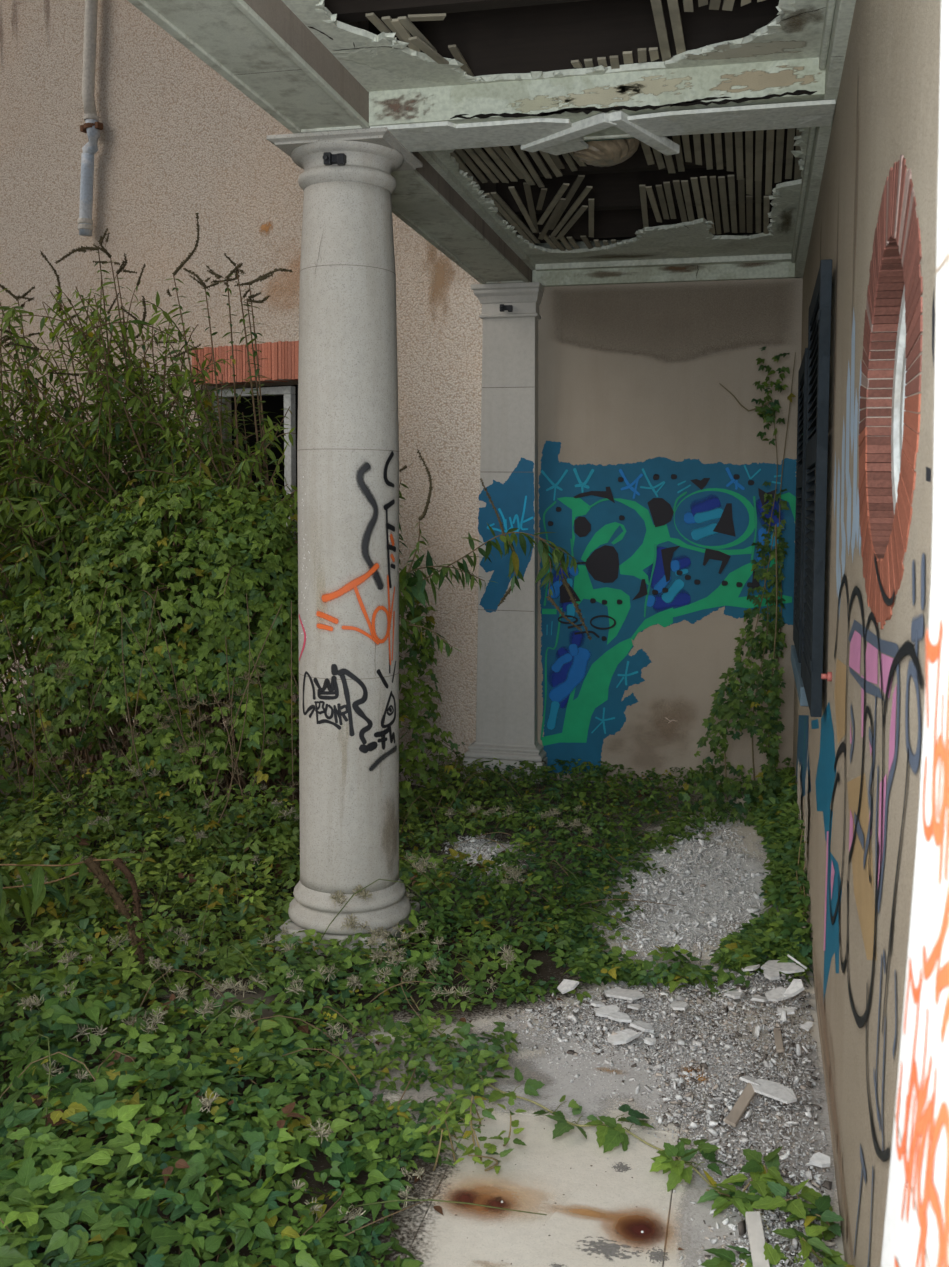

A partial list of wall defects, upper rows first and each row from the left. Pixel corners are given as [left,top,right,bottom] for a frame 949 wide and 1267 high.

flaking render [442,59,564,85]
flaking render [511,0,820,156]
flaking render [791,128,807,170]
flaking render [459,171,547,252]
flaking render [589,221,749,252]
corrosion [453,1185,520,1216]
corrosion [565,1208,660,1244]